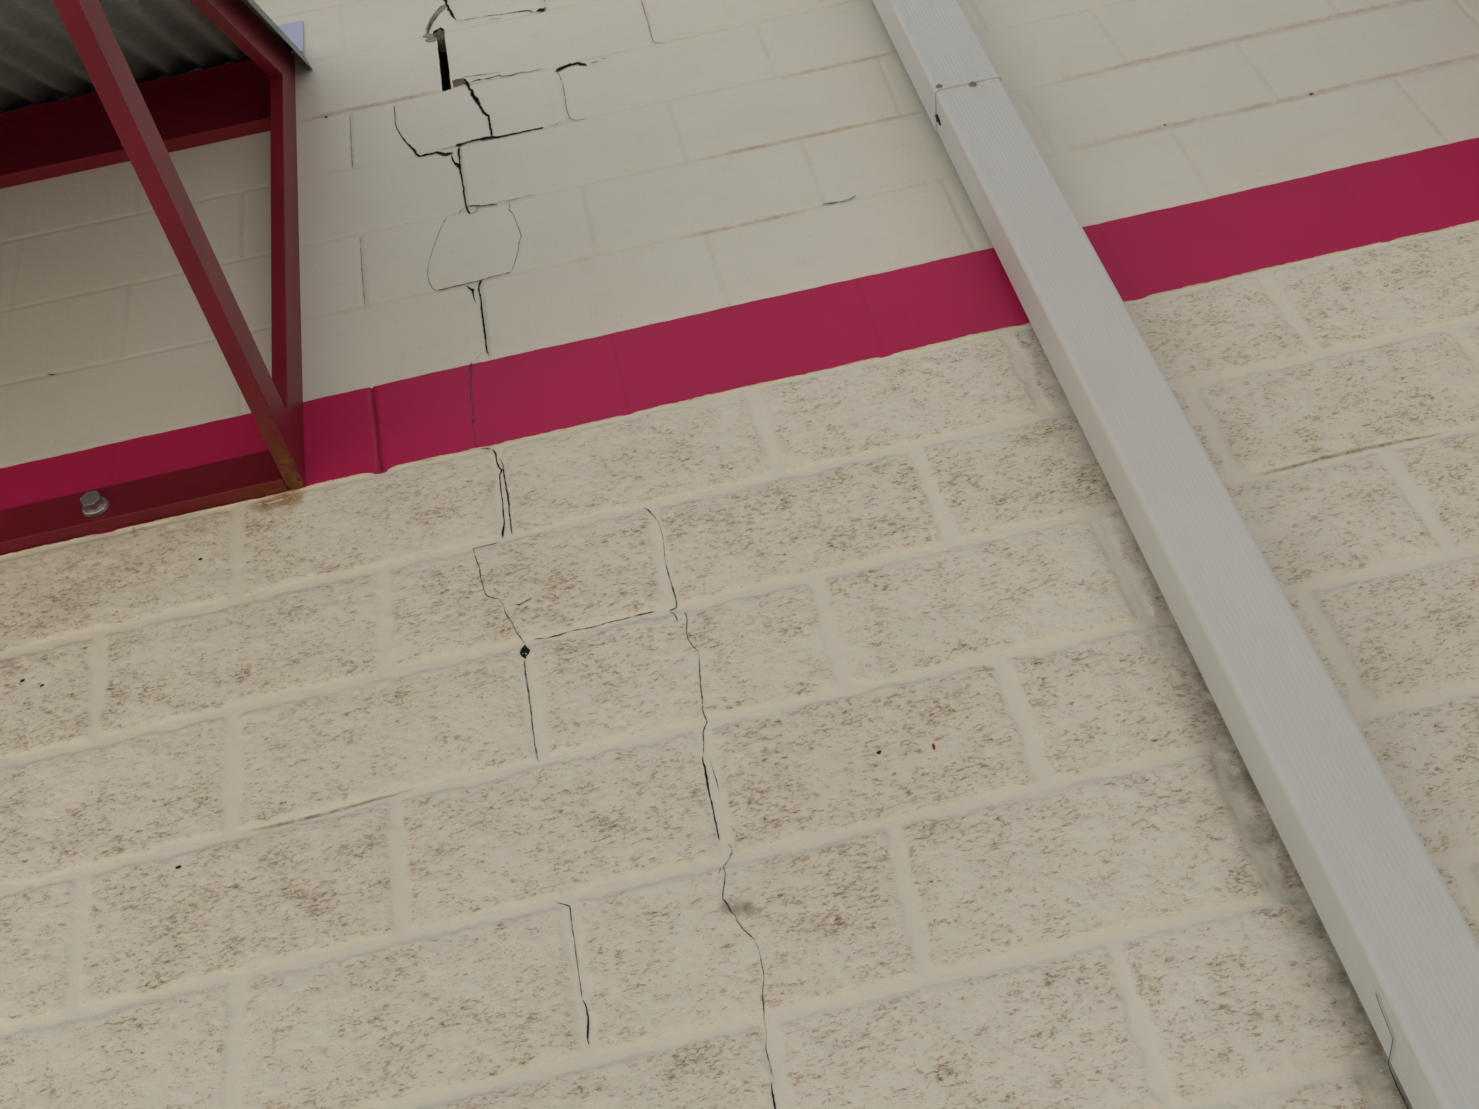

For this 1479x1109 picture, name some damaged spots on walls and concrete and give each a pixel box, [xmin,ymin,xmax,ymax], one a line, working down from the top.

crack [427,0,546,33]
crack [394,58,776,1109]